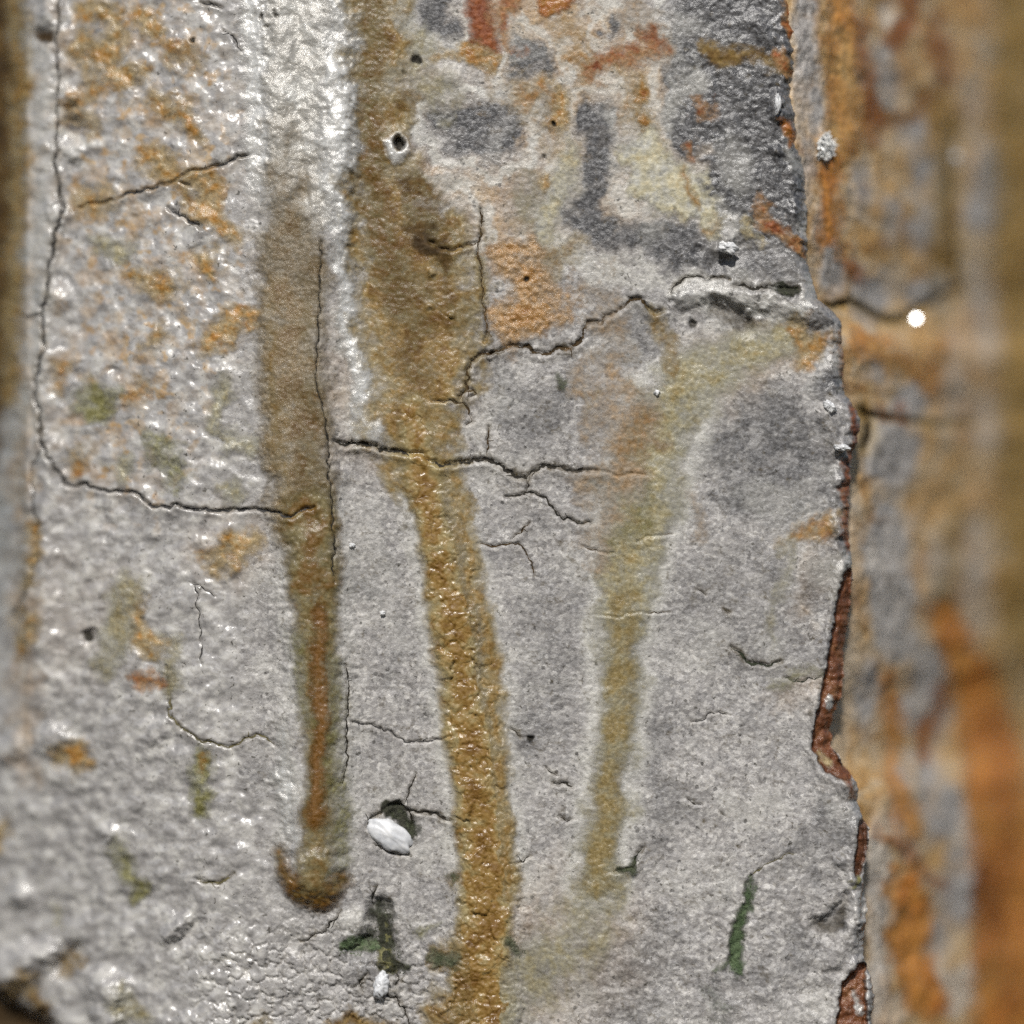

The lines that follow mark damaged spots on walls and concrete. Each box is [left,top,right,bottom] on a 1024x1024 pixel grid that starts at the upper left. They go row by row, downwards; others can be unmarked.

corrosion [64,0,199,137]
corrosion [149,88,205,142]
corrosion [137,142,242,243]
crack [0,0,777,626]
corrosion [341,0,674,1024]
crack [342,667,447,784]
leakage [499,324,800,1024]
spalling [812,569,852,780]
spalling [366,818,413,854]
spalling [851,820,868,889]
corrosion [329,1011,385,1024]
spalling [836,963,868,1024]